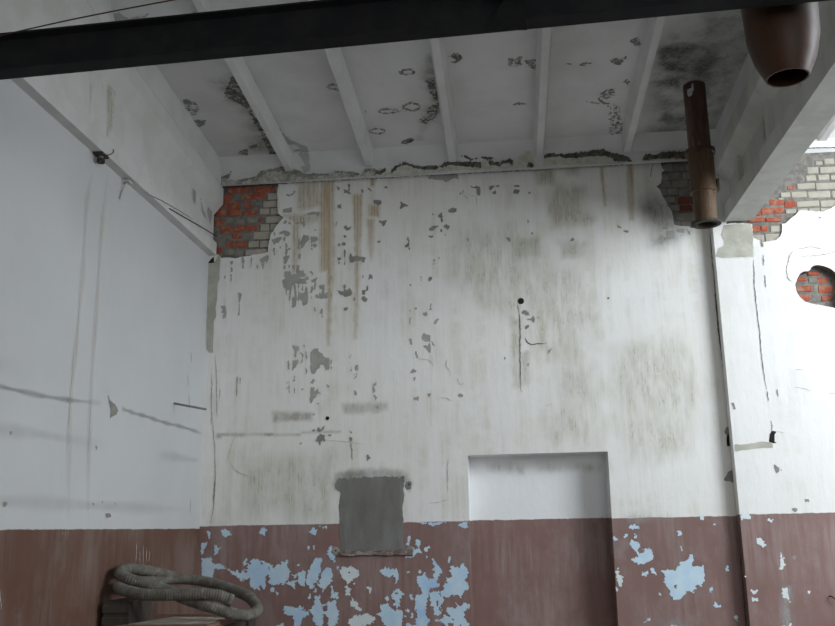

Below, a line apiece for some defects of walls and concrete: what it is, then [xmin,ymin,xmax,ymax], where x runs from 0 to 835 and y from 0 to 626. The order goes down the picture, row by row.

damp [660,45,730,95]
damp [224,76,276,154]
flaking render [658,161,695,241]
flaking render [716,152,835,258]
flaking render [193,184,372,353]
spalling [795,268,835,308]
peeling [286,345,332,404]
peeling [312,416,331,445]
flaking render [200,476,470,626]
peeling [613,524,713,600]